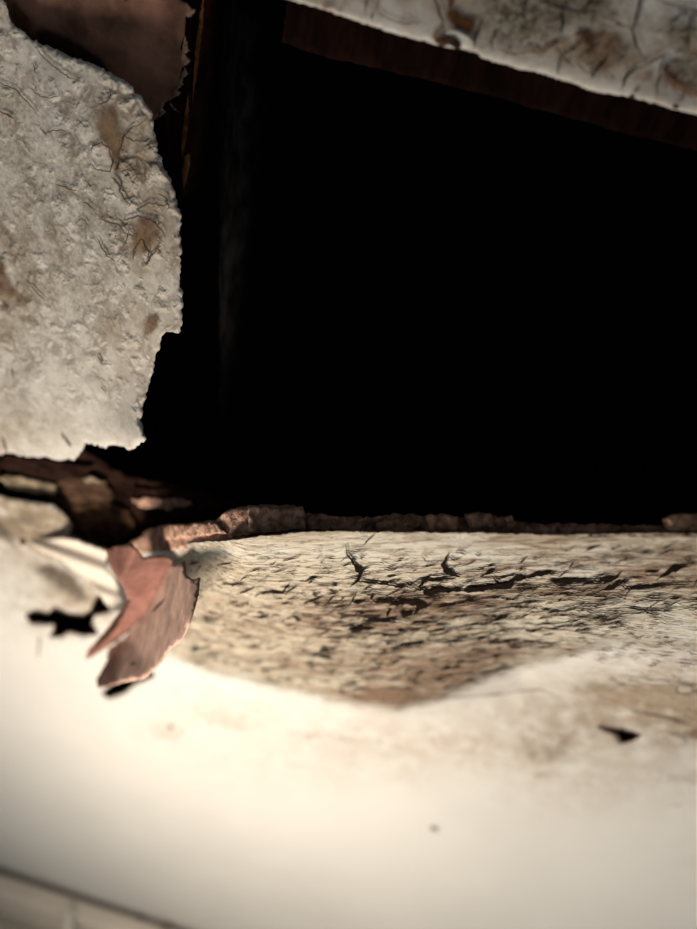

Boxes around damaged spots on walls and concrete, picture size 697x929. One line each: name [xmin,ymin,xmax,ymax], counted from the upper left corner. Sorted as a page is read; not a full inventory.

crack [0,46,74,119]
crack [434,0,445,33]
spalling [434,31,474,50]
damp [485,0,624,75]
crack [470,0,697,101]
crack [57,118,170,266]
spalling [29,504,697,688]
crack [184,535,697,700]